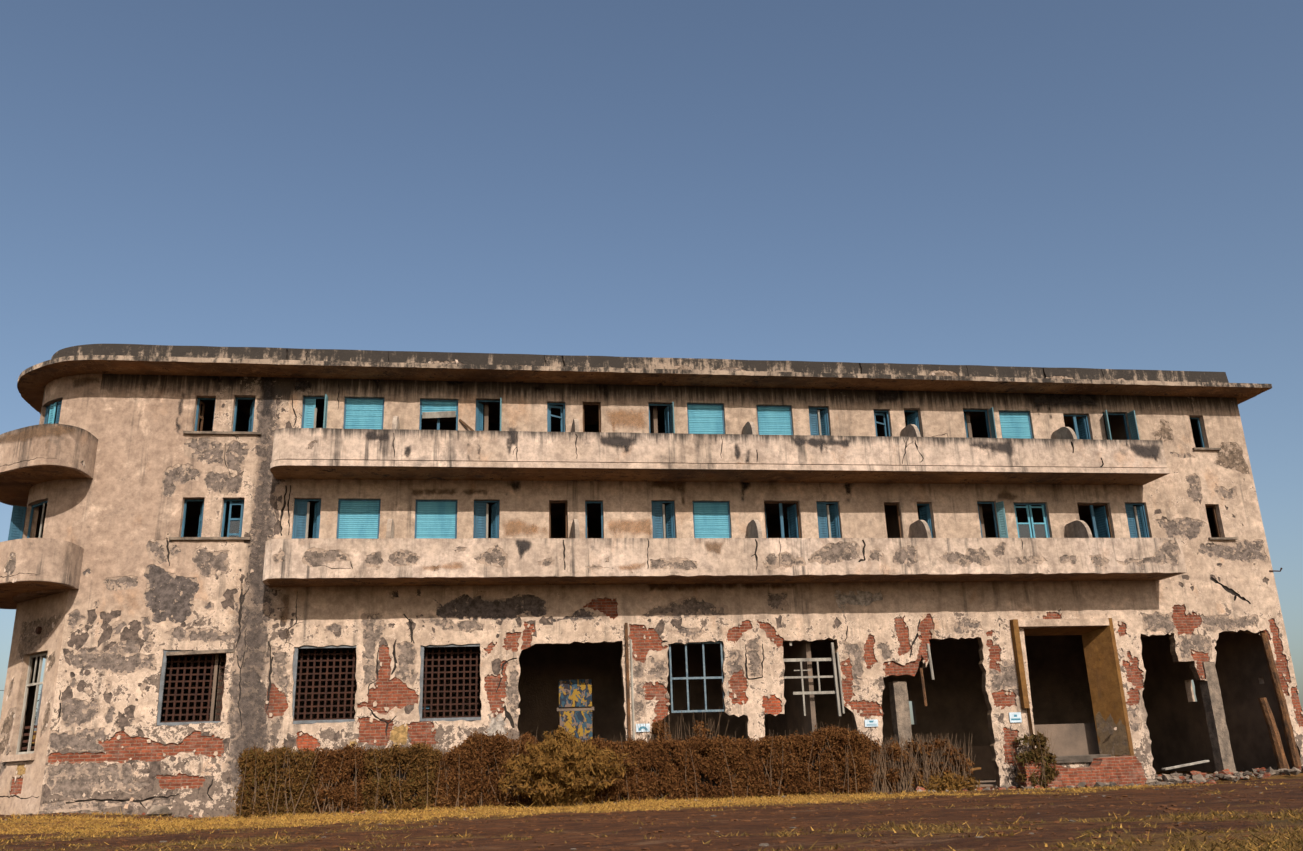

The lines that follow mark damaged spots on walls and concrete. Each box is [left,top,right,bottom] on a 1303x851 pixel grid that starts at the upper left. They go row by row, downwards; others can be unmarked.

peeling [3,552,26,583]
peeling [16,398,789,814]
peeling [762,541,918,570]
peeling [832,590,935,718]
peeling [939,419,1303,766]
peeling [0,677,26,796]